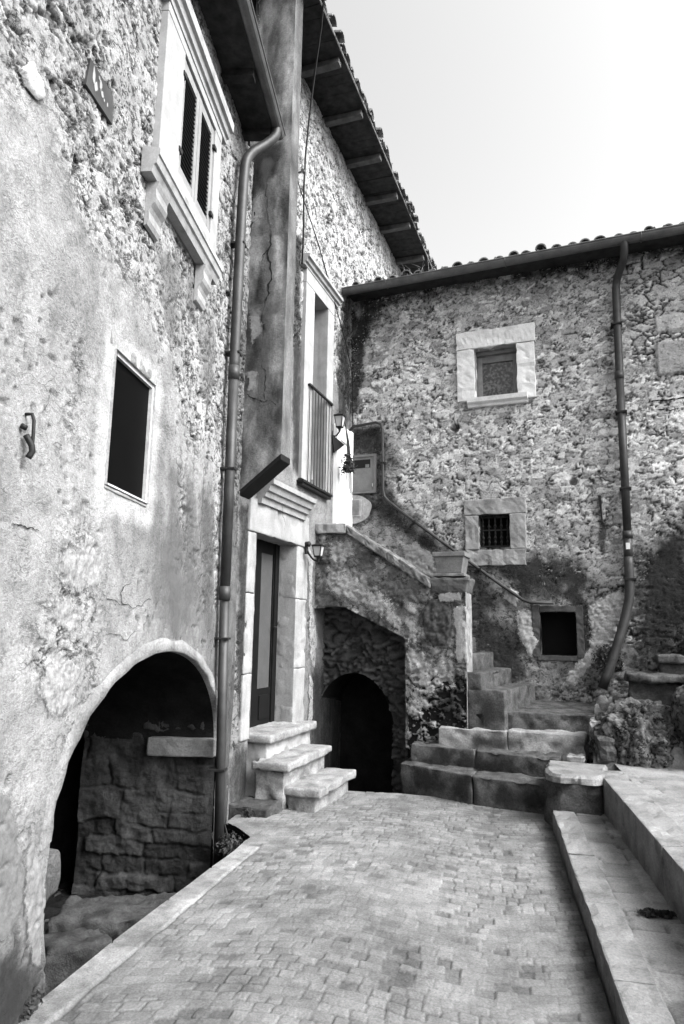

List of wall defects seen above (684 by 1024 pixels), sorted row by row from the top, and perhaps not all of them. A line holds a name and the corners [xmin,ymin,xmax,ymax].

crack [247,175,276,408]
crack [99,584,151,640]